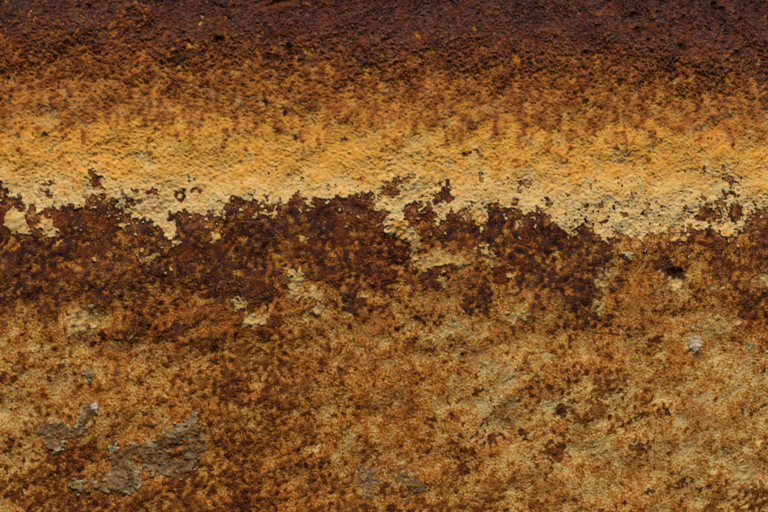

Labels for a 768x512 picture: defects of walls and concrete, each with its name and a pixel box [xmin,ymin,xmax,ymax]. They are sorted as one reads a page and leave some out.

rust [0,0,768,164]
peeling [0,11,768,292]
rust [0,157,768,512]
peeling [37,401,99,454]
peeling [68,411,206,496]